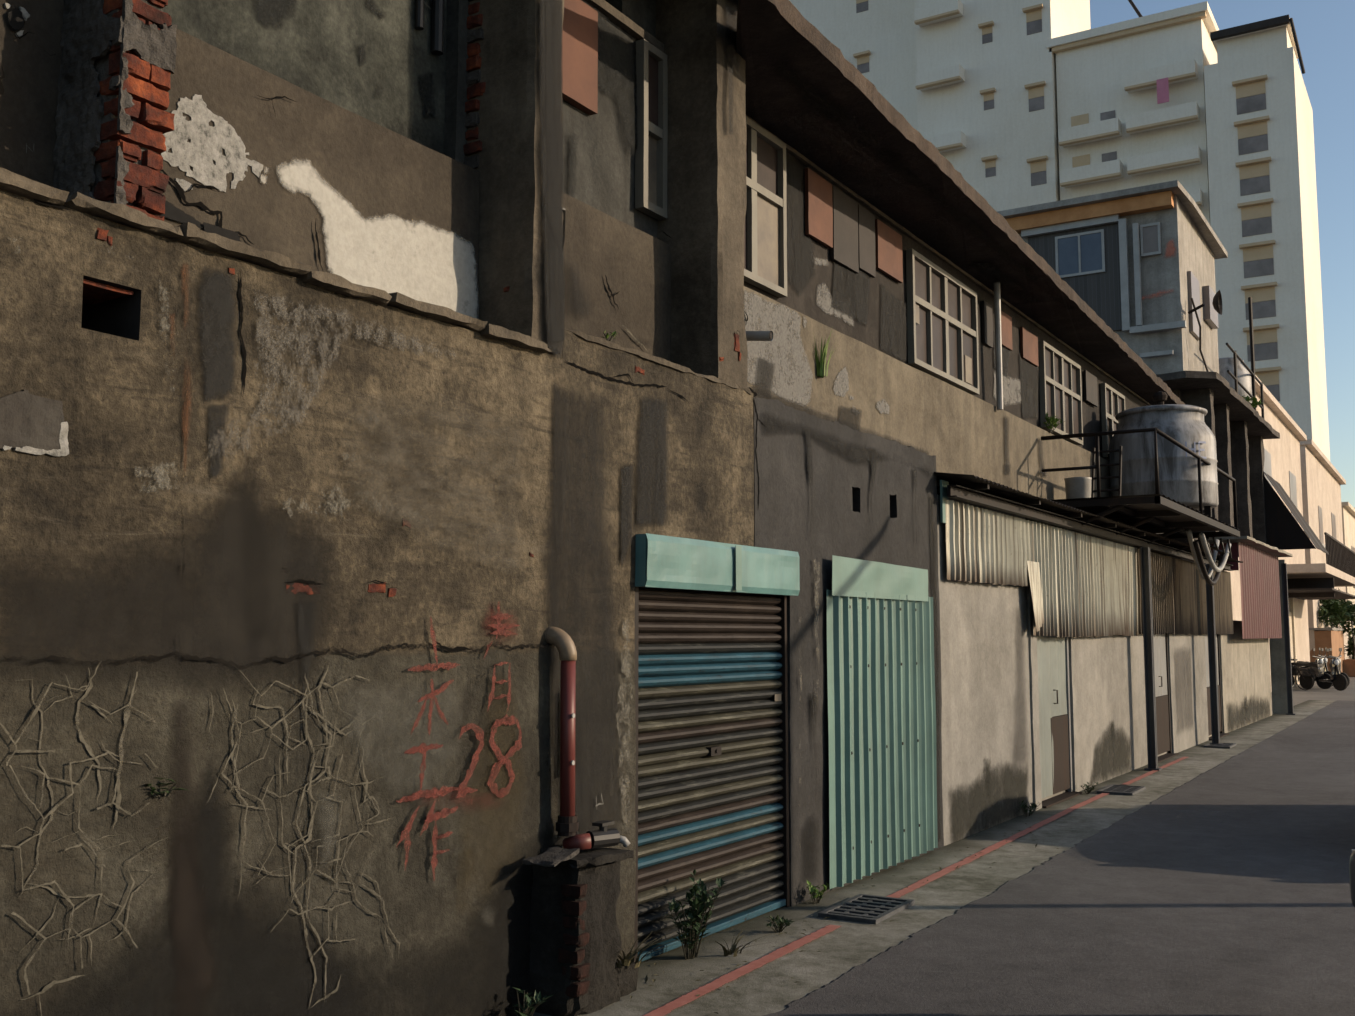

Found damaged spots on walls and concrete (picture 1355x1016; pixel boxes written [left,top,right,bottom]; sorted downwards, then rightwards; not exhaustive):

flaking render [53,0,478,319]
flaking render [463,0,486,169]
spalling [2,422,69,457]
peeling [719,290,813,407]
peeling [817,284,854,325]
leakage [0,483,350,682]
leakage [752,358,1028,843]
crack [0,638,549,1016]
leakage [65,390,668,1016]
leakage [1089,724,1131,788]